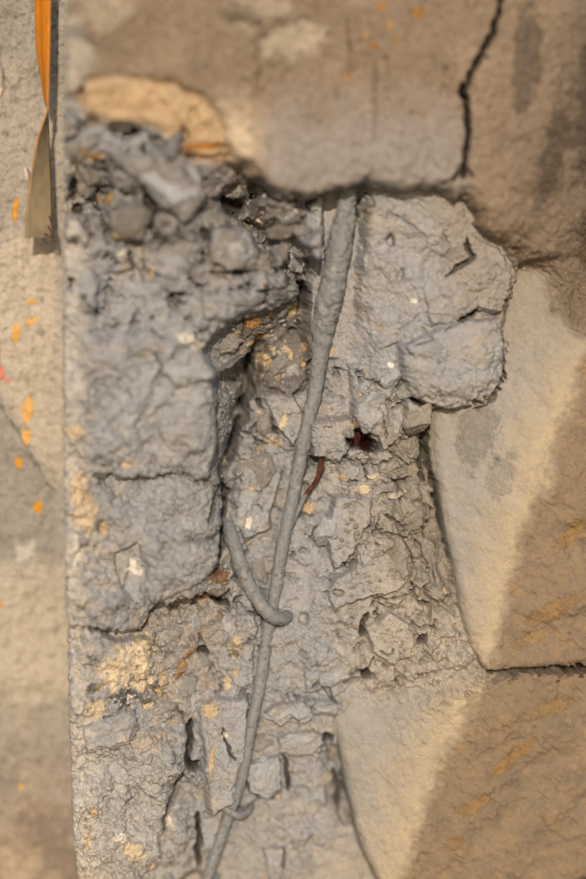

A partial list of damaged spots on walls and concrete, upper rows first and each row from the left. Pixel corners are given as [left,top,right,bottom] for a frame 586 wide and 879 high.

crack [441,0,504,185]
spalling [63,76,478,879]
crack [221,727,238,762]
crack [162,773,183,831]
crack [194,811,203,867]